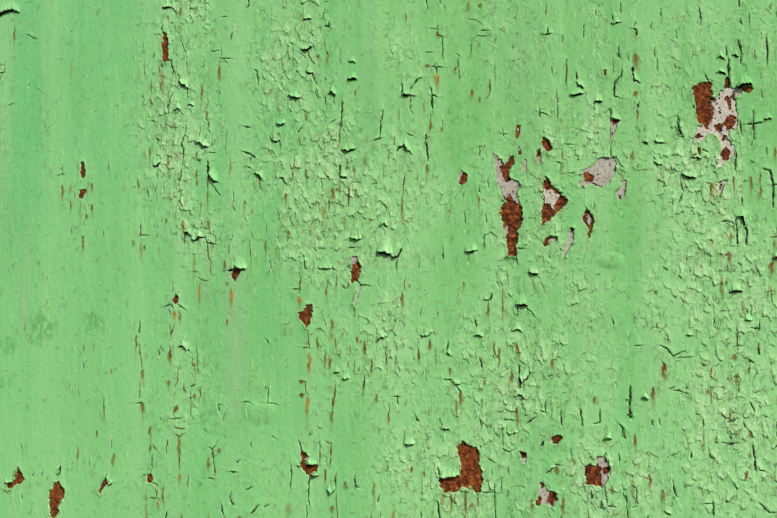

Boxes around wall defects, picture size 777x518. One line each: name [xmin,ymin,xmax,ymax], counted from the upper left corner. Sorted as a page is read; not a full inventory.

peeling [0,0,20,16]
crack [705,0,769,82]
crack [144,0,298,281]
crack [375,19,496,199]
crack [539,62,582,117]
crack [593,47,684,202]
corrosion [691,78,753,164]
corrosion [492,125,523,256]
corrosion [539,177,572,247]
corrosion [45,481,65,518]
corrosion [439,441,486,506]
corrosion [572,455,613,493]